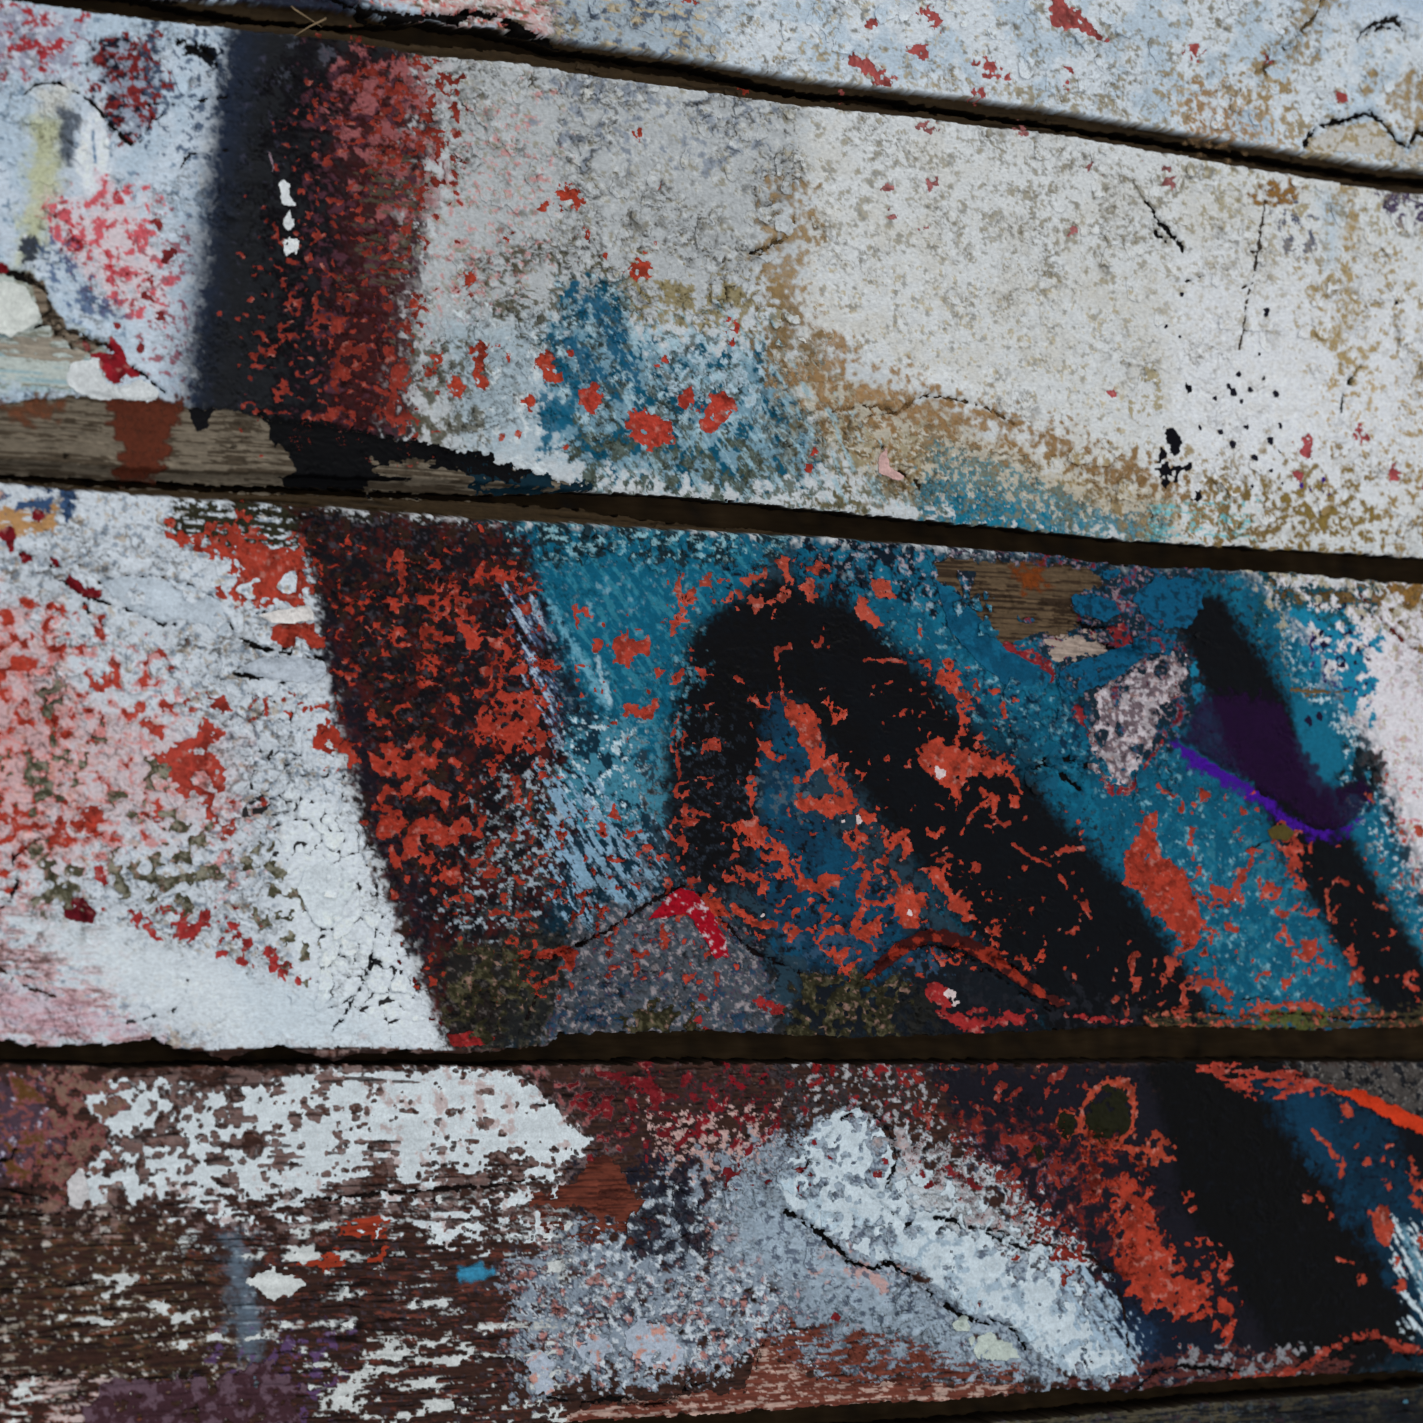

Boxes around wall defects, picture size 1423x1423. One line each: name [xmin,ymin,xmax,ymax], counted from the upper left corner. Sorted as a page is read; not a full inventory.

crack [1255,0,1324,76]
crack [1356,15,1403,42]
crack [1290,110,1423,159]
peeling [0,262,41,337]
spalling [126,247,177,321]
spalling [217,25,819,467]
peeling [66,322,159,402]
crack [832,393,1015,490]
peeling [47,1062,1243,1423]
crack [783,1107,1240,1390]
crack [1329,1340,1423,1361]
peeling [0,1376,43,1423]